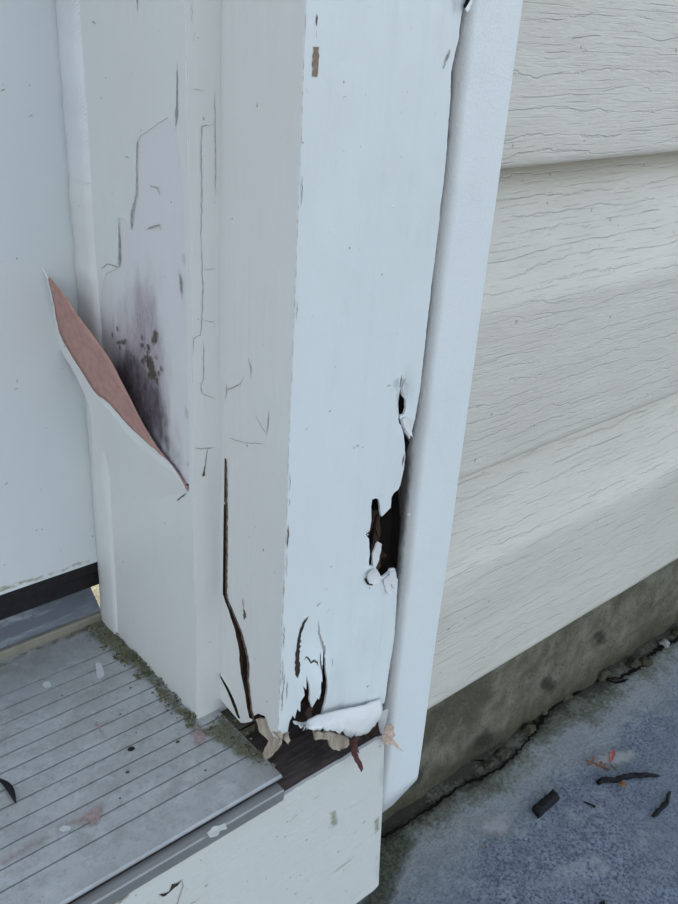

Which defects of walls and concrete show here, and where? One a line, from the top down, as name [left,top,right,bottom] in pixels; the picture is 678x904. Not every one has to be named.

crack [102,143,161,268]
crack [175,71,251,398]
peeling [43,267,189,501]
mould [111,314,168,448]
spalling [398,395,413,455]
crack [193,411,333,719]
spalling [367,490,401,589]
peeling [293,699,388,751]
crack [381,637,678,840]